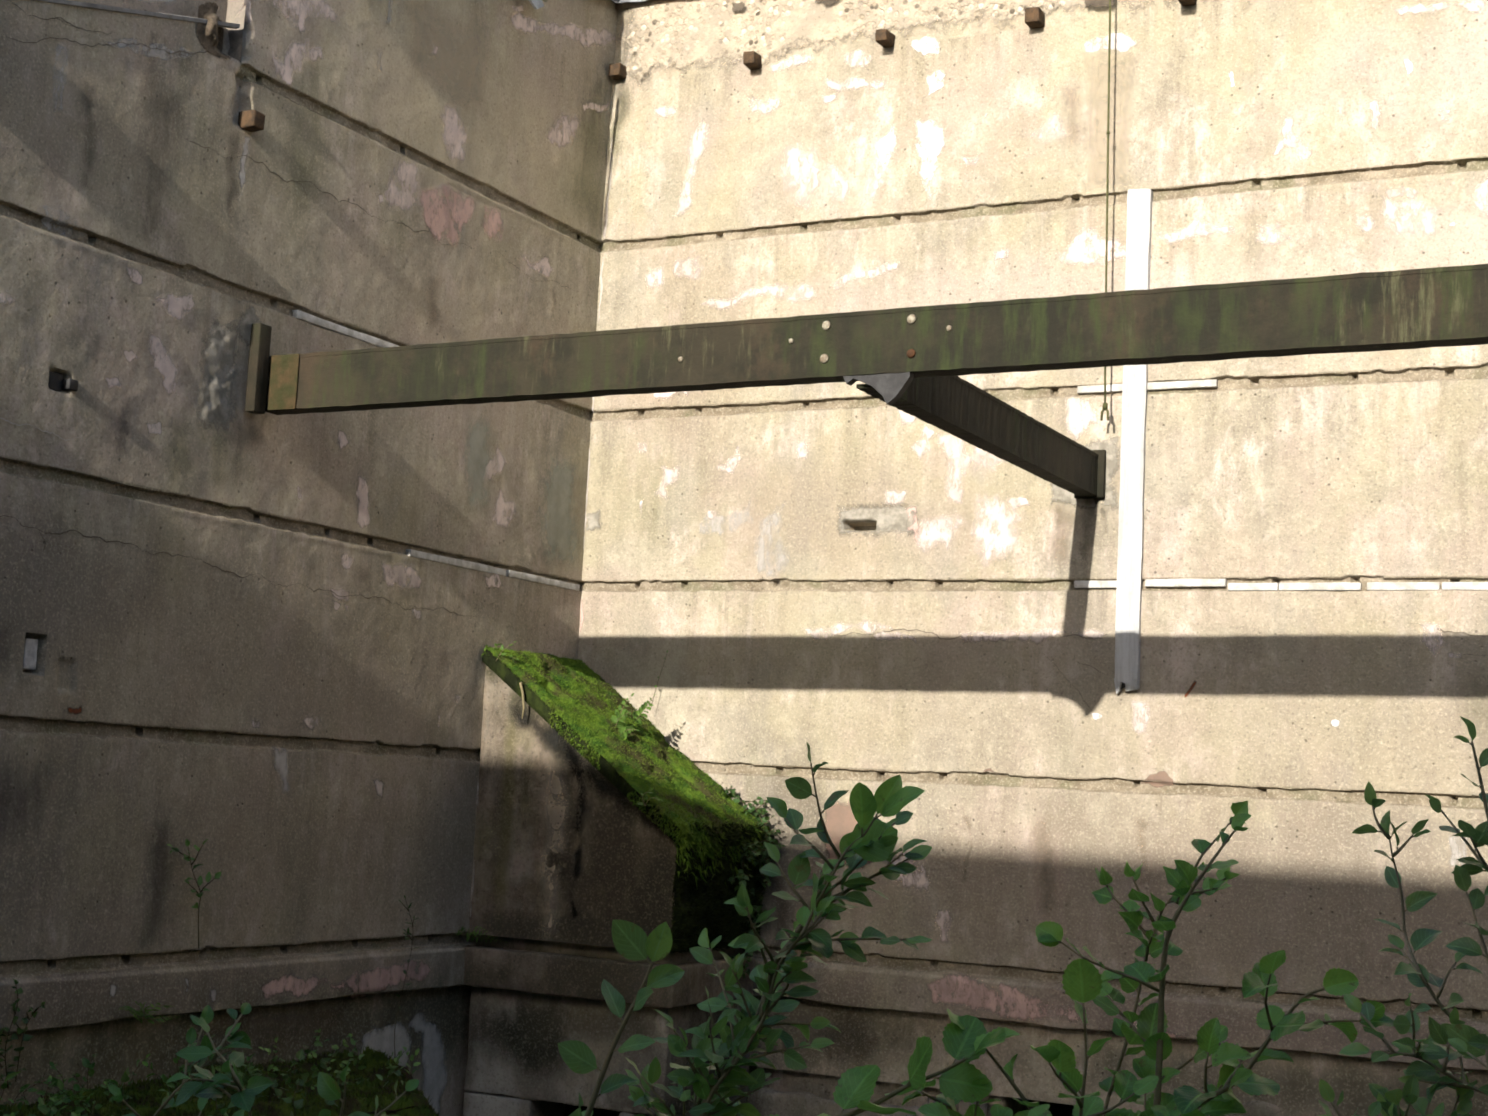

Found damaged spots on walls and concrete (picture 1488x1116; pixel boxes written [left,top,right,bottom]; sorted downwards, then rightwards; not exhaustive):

spalling [512,0,1176,103]
crack [184,138,613,322]
peeling [379,162,502,243]
peeling [783,128,896,203]
peeling [916,121,944,197]
peeling [158,294,194,319]
peeling [124,335,177,394]
crack [1410,623,1488,656]